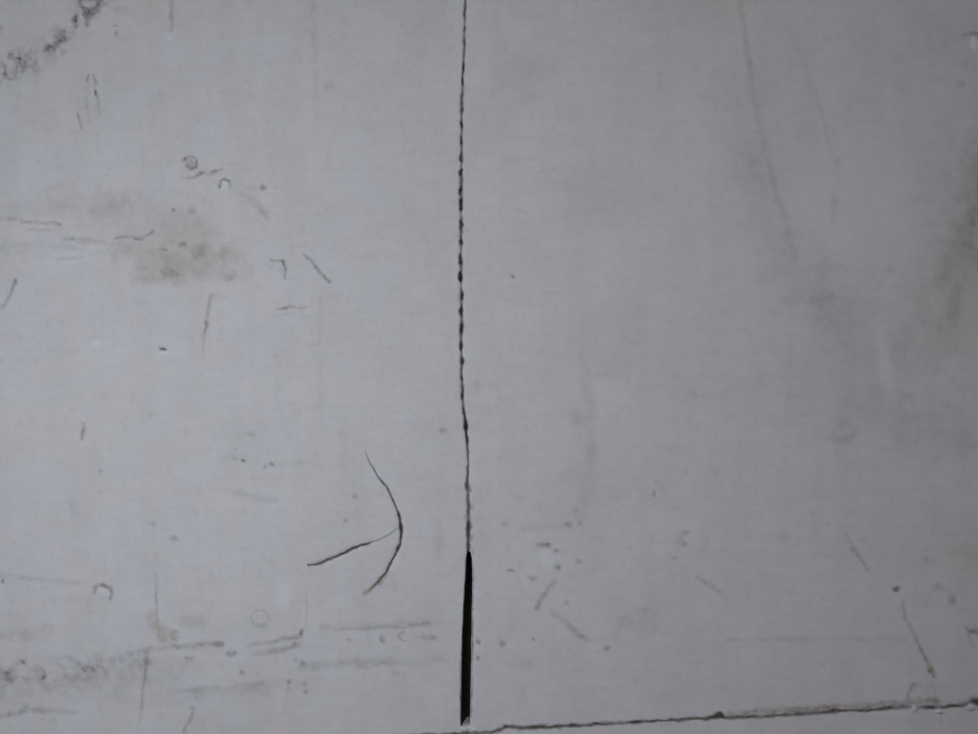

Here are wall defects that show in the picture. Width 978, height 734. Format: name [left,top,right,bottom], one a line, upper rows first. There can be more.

crack [444,47,978,734]
crack [307,542,369,565]
crack [368,468,403,592]